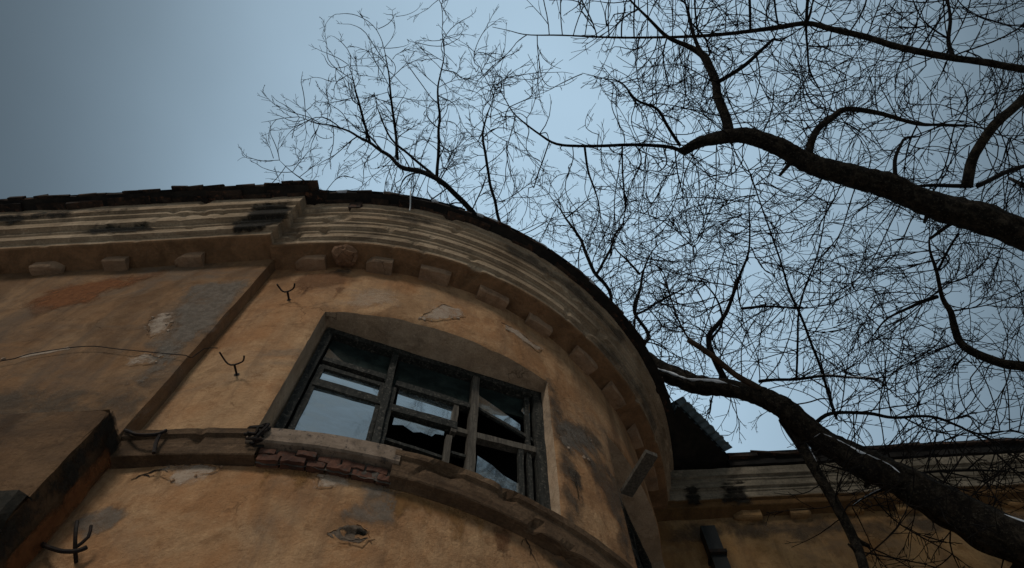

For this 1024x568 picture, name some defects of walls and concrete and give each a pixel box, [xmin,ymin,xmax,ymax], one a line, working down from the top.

peeling [160,464,223,484]
flaking render [255,448,391,490]
hole [326,523,375,549]